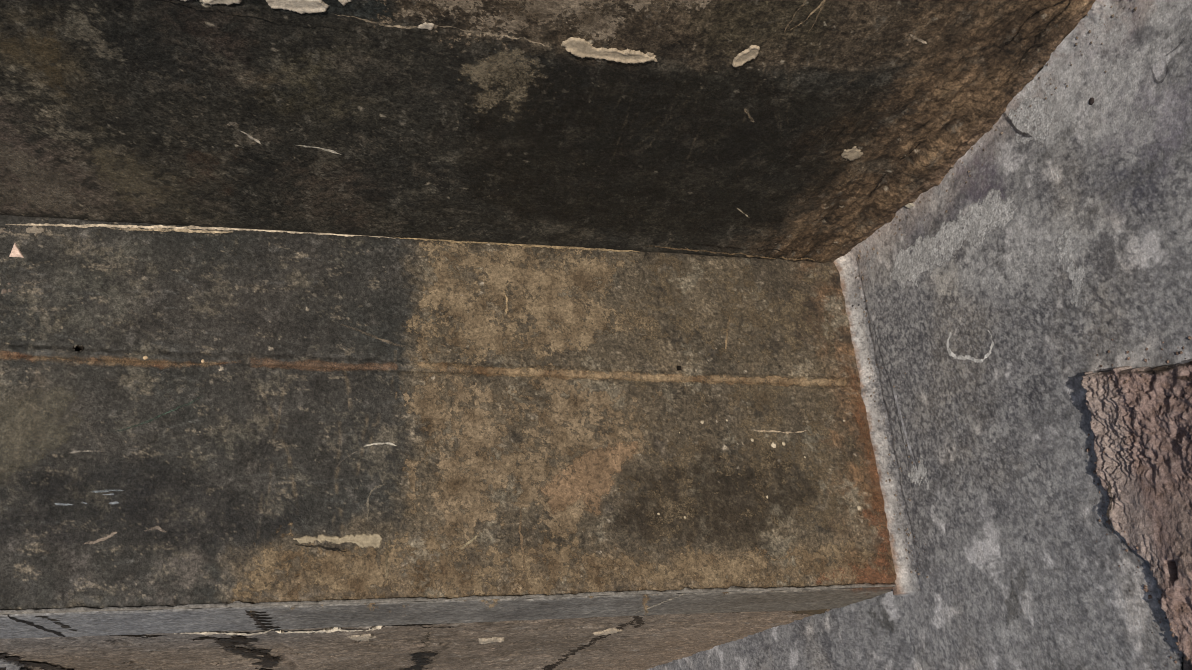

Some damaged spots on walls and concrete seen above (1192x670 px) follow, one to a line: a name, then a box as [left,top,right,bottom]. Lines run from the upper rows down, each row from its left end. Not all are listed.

flaking render [266,0,351,14]
peeling [376,0,711,120]
flaking render [732,45,760,67]
crack [1000,0,1092,90]
leakage [0,145,90,212]
crack [869,143,920,197]
peeling [232,240,895,615]